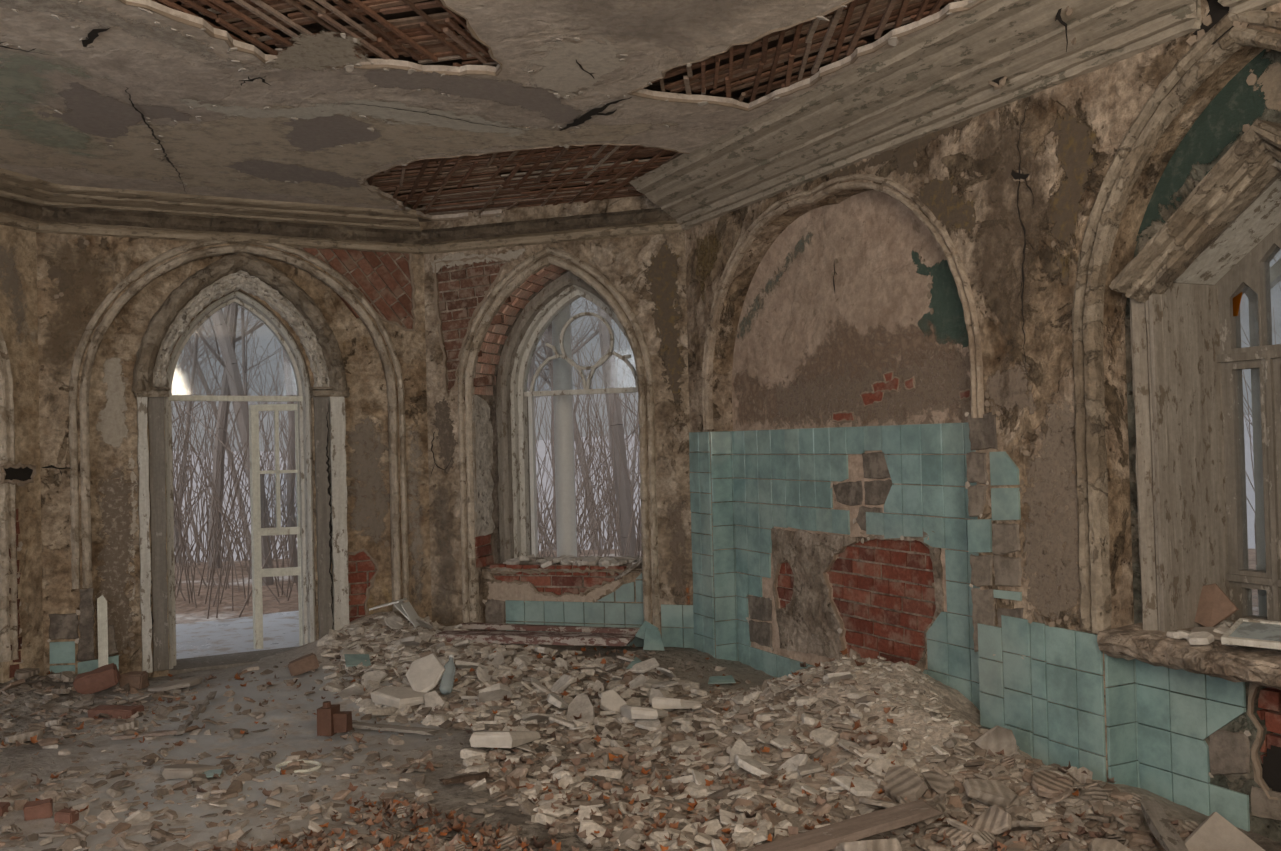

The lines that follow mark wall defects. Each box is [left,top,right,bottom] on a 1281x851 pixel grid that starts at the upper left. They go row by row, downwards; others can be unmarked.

crack [125,89,187,195]
flaking render [38,0,689,221]
flaking render [628,0,986,112]
peeling [1136,49,1281,241]
spalling [1186,0,1267,46]
spalling [294,247,566,474]
spalling [347,548,379,623]
spalling [746,452,944,673]
spalling [1209,683,1281,821]